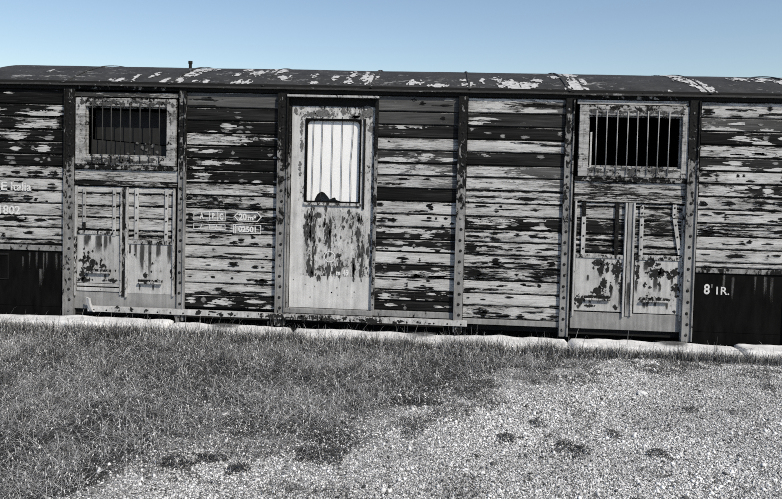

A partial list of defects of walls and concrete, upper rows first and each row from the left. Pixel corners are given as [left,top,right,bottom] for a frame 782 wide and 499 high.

peeling [0,106,64,189]
peeling [186,112,278,269]
peeling [378,152,457,185]
peeling [468,99,566,134]
peeling [460,74,589,90]
peeling [698,105,782,258]
corrosion [77,235,118,283]
peeling [186,276,347,323]
corrosion [303,205,372,293]
peeling [375,203,455,309]
peeling [464,167,562,320]
corrosion [574,259,680,314]